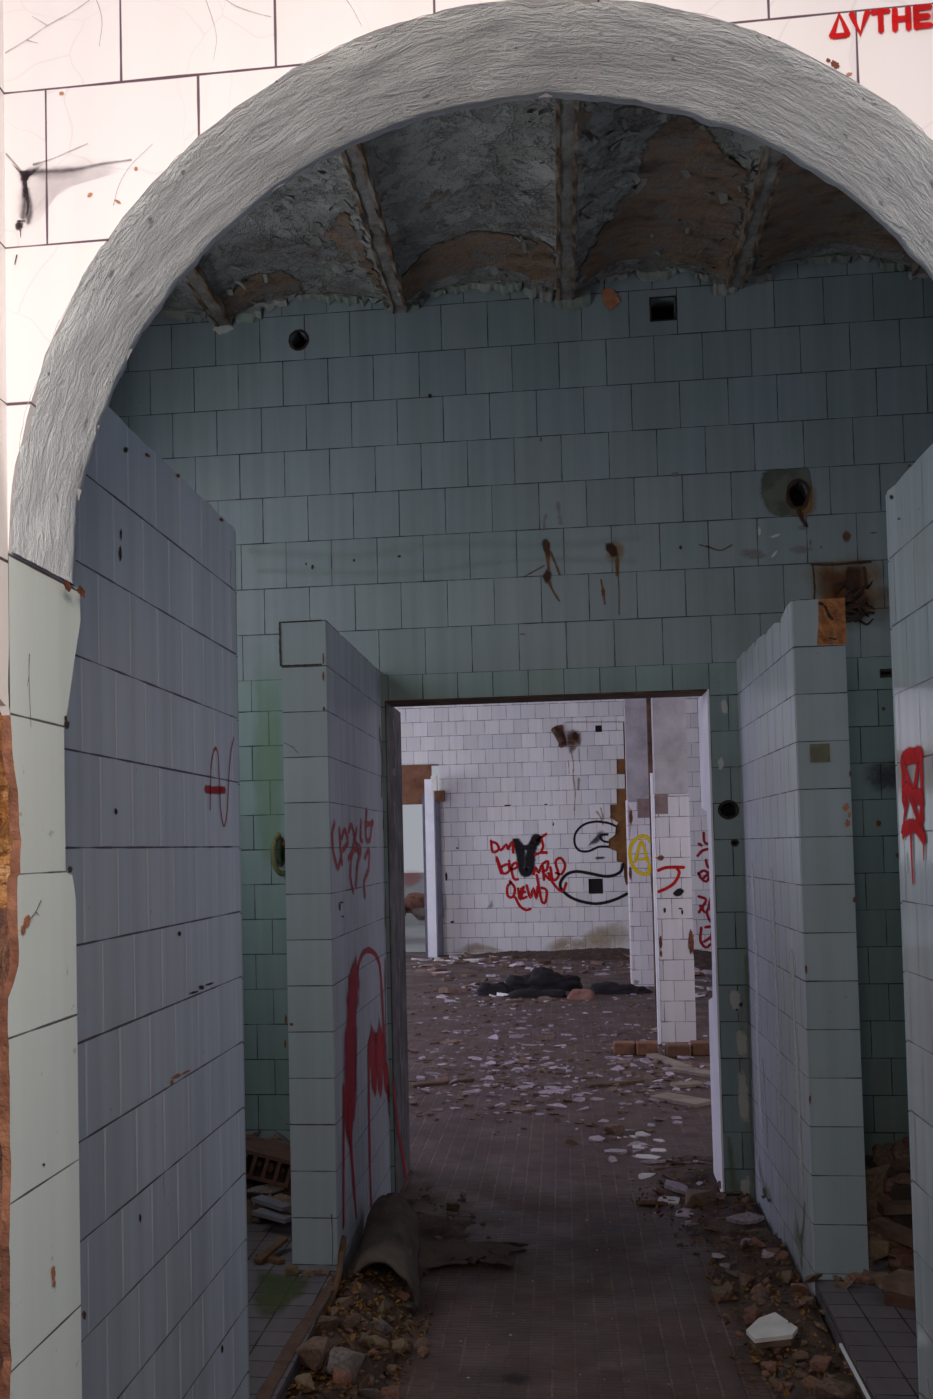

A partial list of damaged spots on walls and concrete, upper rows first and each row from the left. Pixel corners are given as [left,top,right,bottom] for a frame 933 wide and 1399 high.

crack [5,0,102,53]
damp [6,143,131,238]
flaking render [742,156,915,272]
flaking render [213,325,233,335]
corrosion [525,502,561,601]
corrosion [600,544,621,604]
corrosion [811,561,882,608]
spalling [0,712,31,994]